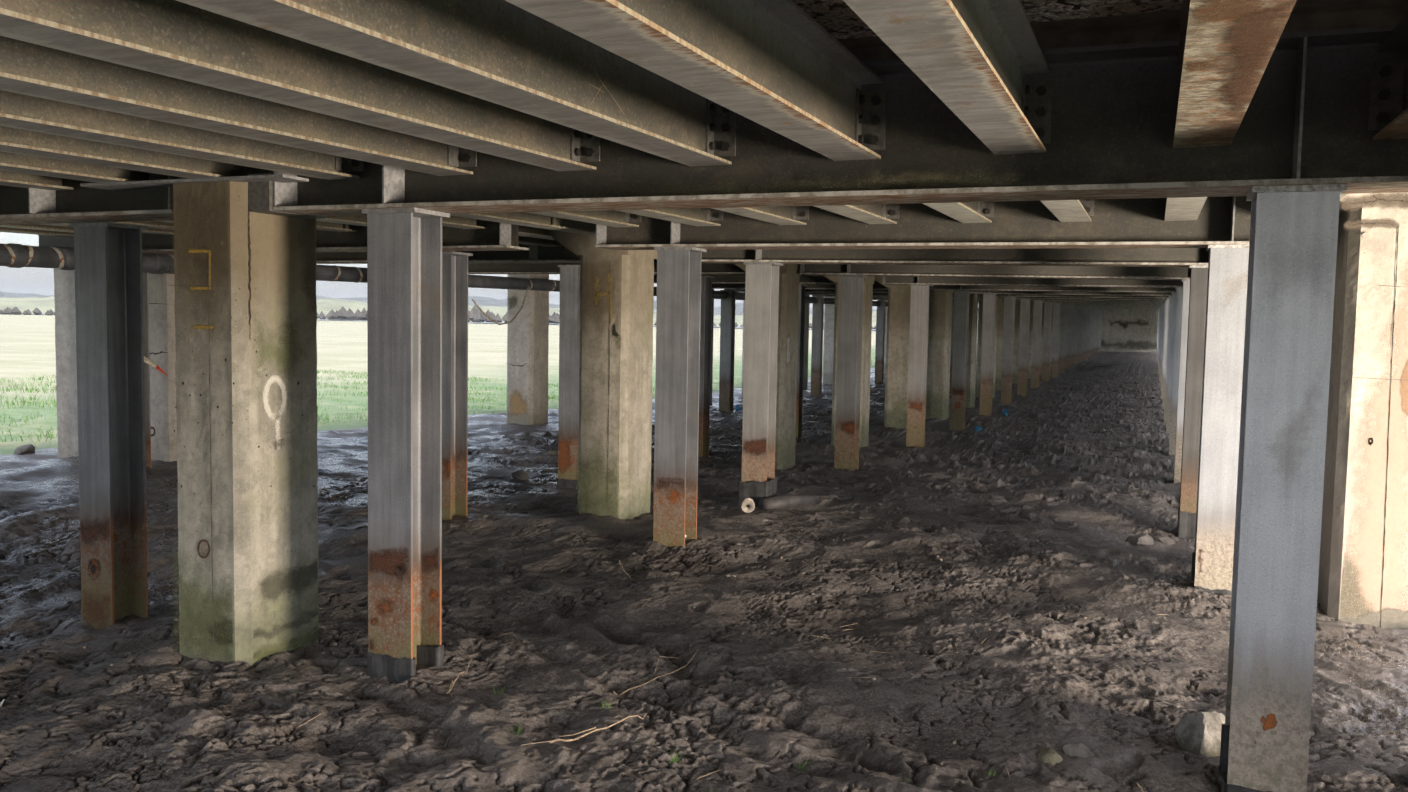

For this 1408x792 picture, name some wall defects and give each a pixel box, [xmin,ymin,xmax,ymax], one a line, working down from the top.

corrosion [1187,61,1219,71]
corrosion [744,439,766,455]
corrosion [81,520,109,580]
leakage [261,562,317,599]
corrosion [369,549,438,581]
leakage [254,611,318,659]
corrosion [1255,714,1277,744]